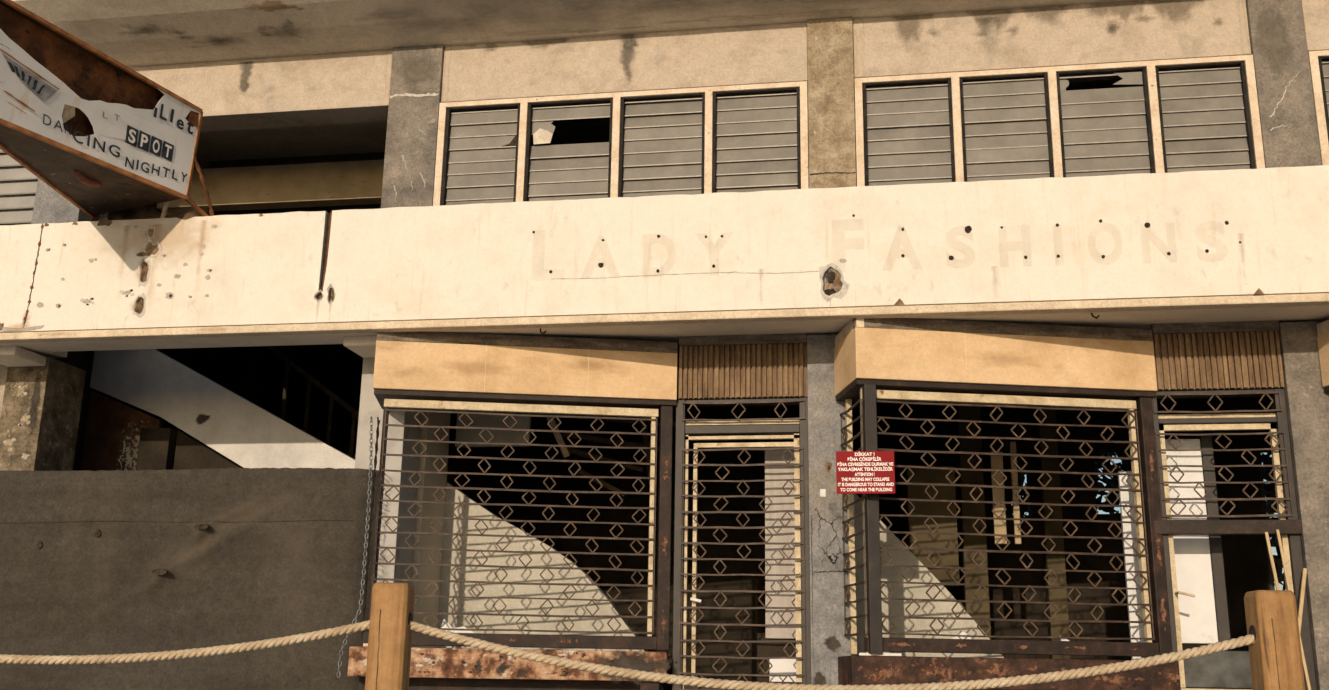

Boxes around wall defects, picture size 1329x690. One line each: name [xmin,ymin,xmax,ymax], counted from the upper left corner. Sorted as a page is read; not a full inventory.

damp [972,5,1067,48]
damp [1092,0,1203,30]
damp [618,27,636,77]
crack [23,224,44,328]
spalling [119,225,212,318]
crack [314,212,336,304]
spalling [819,259,850,302]
peeling [13,381,28,397]
peeling [3,415,30,460]
rust [418,653,443,673]
rust [473,658,527,677]
rust [561,639,671,685]